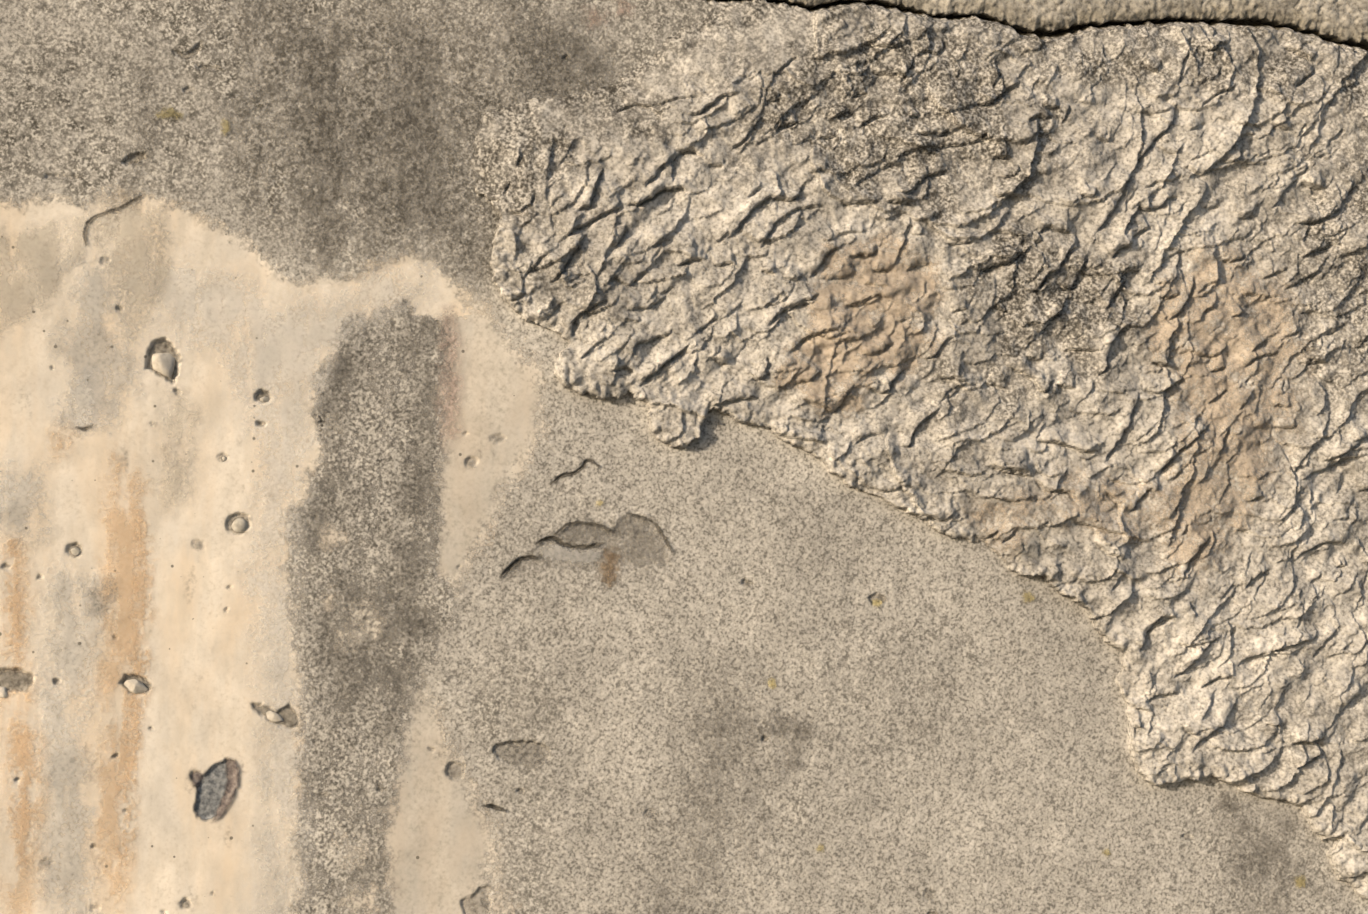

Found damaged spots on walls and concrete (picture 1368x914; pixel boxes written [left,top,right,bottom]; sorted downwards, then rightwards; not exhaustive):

crack [706,0,1368,51]
peeling [0,186,550,914]
water stain [151,269,460,914]
spalling [500,513,672,583]
spalling [775,232,941,414]
spalling [1148,245,1297,567]